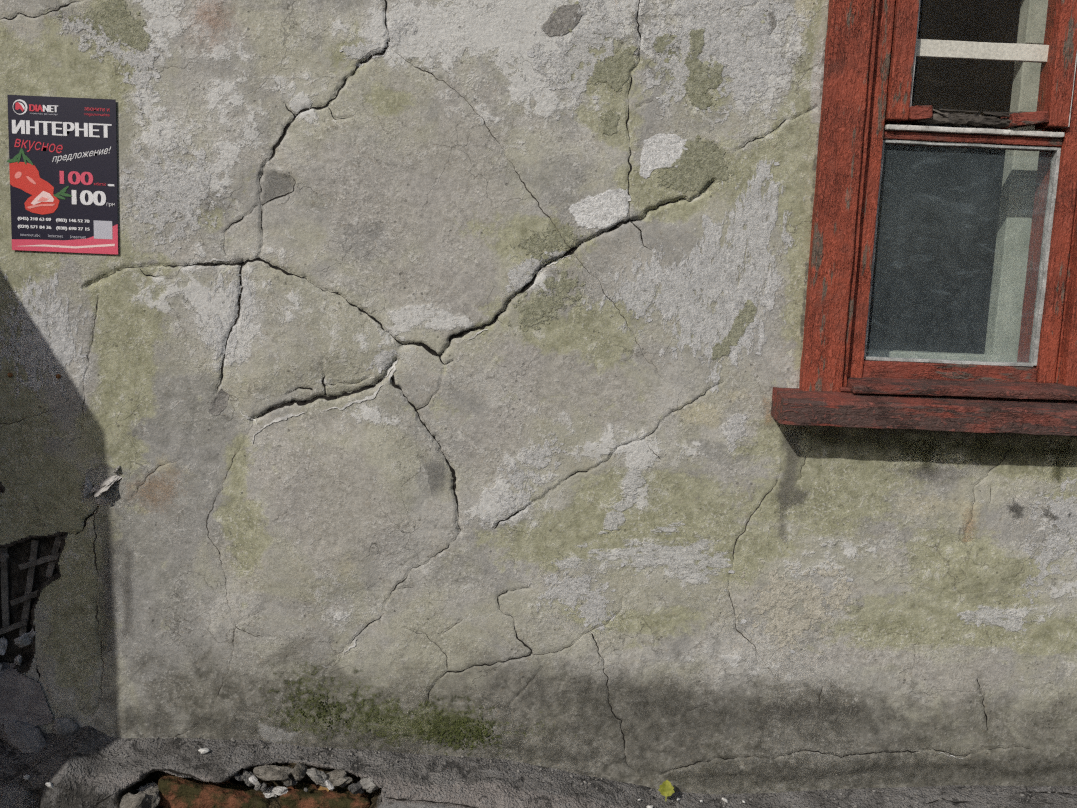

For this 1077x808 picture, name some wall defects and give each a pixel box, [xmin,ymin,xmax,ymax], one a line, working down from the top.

crack [1,0,83,20]
crack [80,0,722,717]
spalling [84,466,122,505]
leakage [779,433,804,504]
leakage [854,435,1076,478]
spalling [0,532,68,673]
crack [63,481,104,717]
crack [728,431,821,717]
crack [409,587,636,772]
crack [676,679,1033,769]
crack [94,769,235,808]
crack [386,797,476,808]